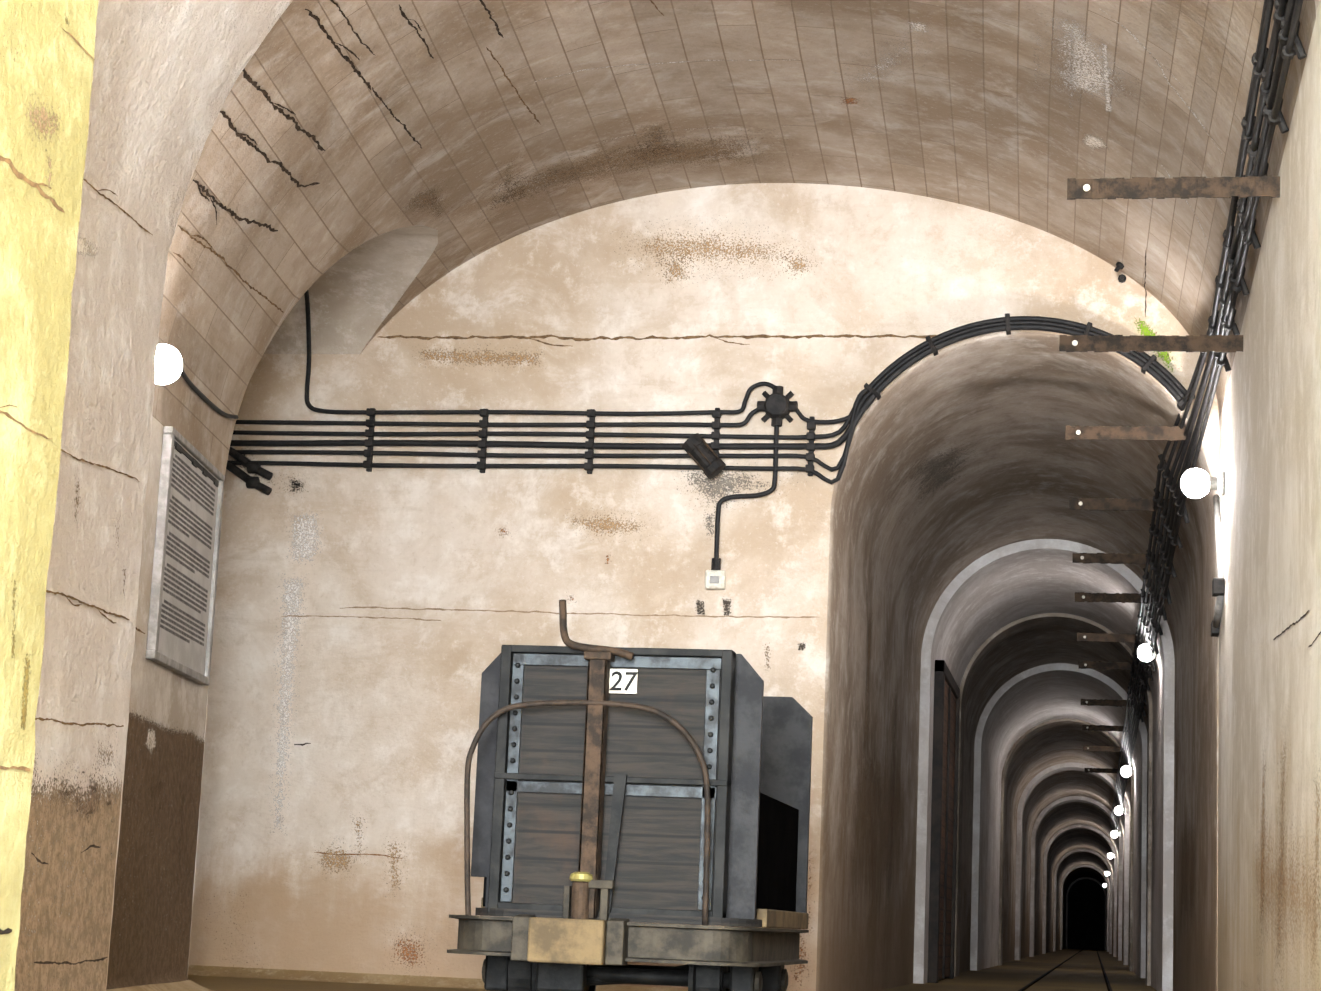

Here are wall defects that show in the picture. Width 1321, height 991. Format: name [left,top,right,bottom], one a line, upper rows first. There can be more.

crack [399,4,434,59]
crack [0,156,65,213]
crack [220,111,320,187]
crack [243,69,326,151]
crack [305,0,422,149]
crack [83,178,284,313]
crack [379,334,936,347]
water stain [14,710,205,991]